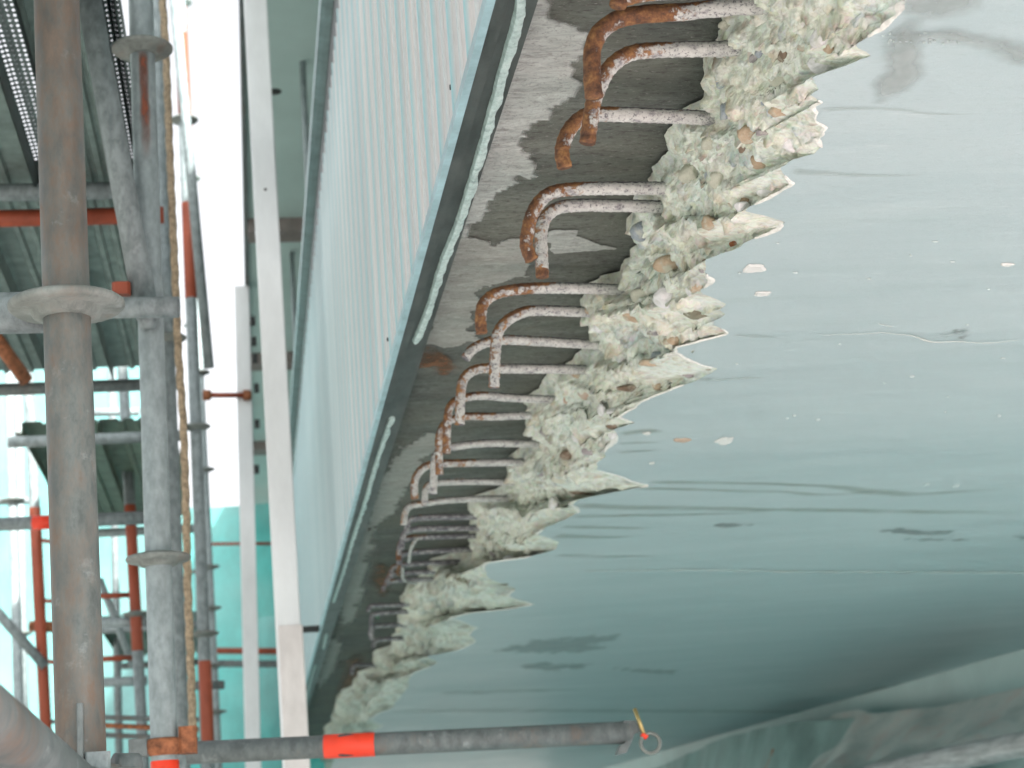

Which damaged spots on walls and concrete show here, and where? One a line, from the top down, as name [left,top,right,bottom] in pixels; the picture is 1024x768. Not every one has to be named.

spalling [316,0,967,734]